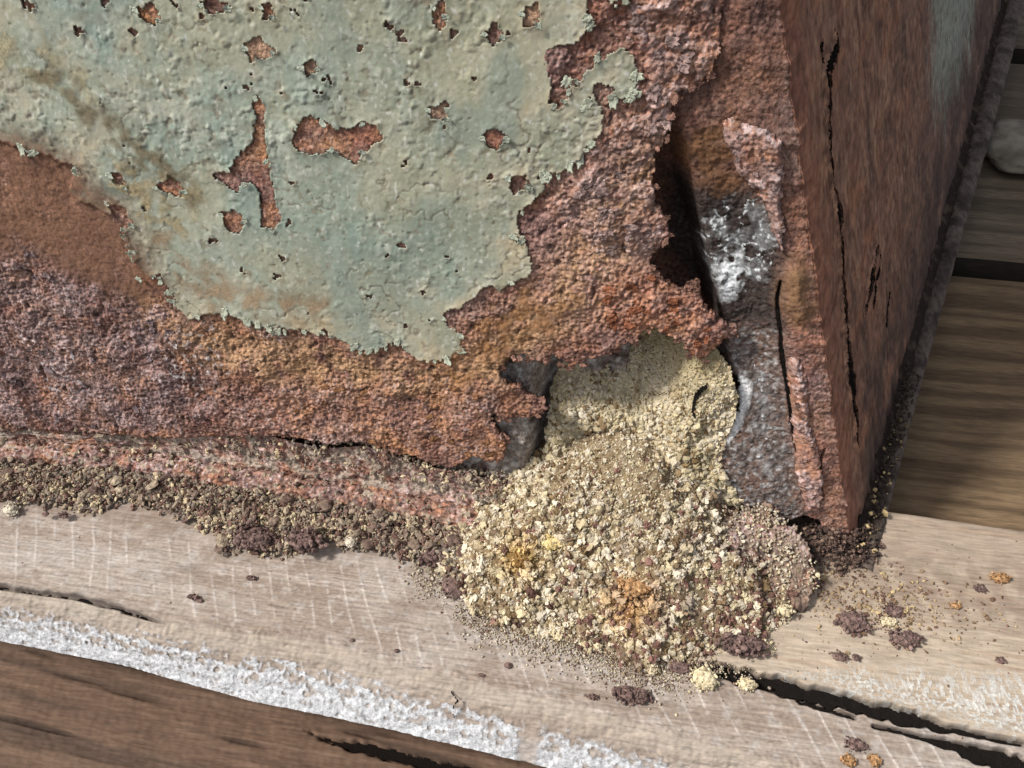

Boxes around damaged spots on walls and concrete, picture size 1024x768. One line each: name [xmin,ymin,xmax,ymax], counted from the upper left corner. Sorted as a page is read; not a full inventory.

peeling [130,2,163,26]
rust [0,46,198,301]
peeling [214,95,281,235]
peeling [290,115,383,164]
peeling [503,140,596,194]
peeling [607,71,645,110]
rust [580,170,675,257]
rust [650,33,717,153]
water stain [700,203,776,300]
crack [821,29,891,454]
rust [481,264,712,372]
crack [775,280,796,448]